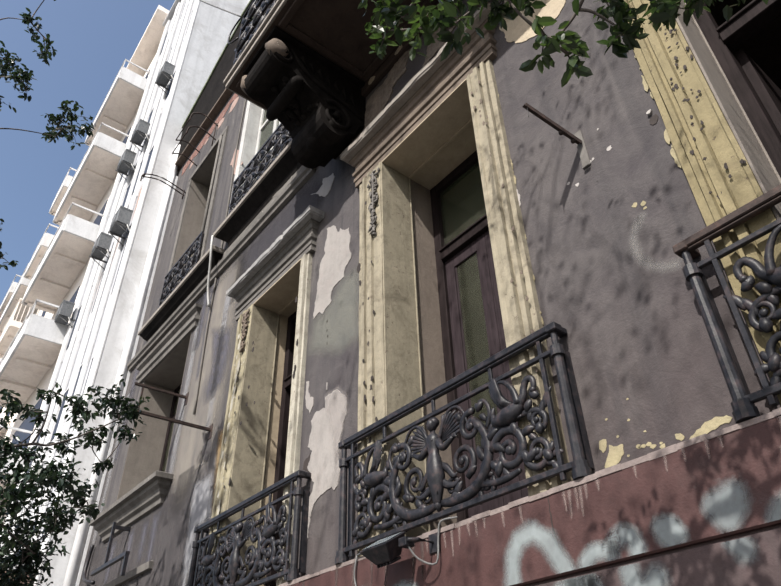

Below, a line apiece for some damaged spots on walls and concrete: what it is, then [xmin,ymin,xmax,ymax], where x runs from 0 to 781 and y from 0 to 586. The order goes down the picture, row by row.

peeling [499,0,566,44]
peeling [667,42,701,102]
spalling [646,109,658,125]
spalling [664,129,682,169]
peeling [311,173,335,197]
peeling [313,225,361,319]
spalling [675,415,732,441]
peeling [303,381,347,539]
spalling [599,435,630,468]